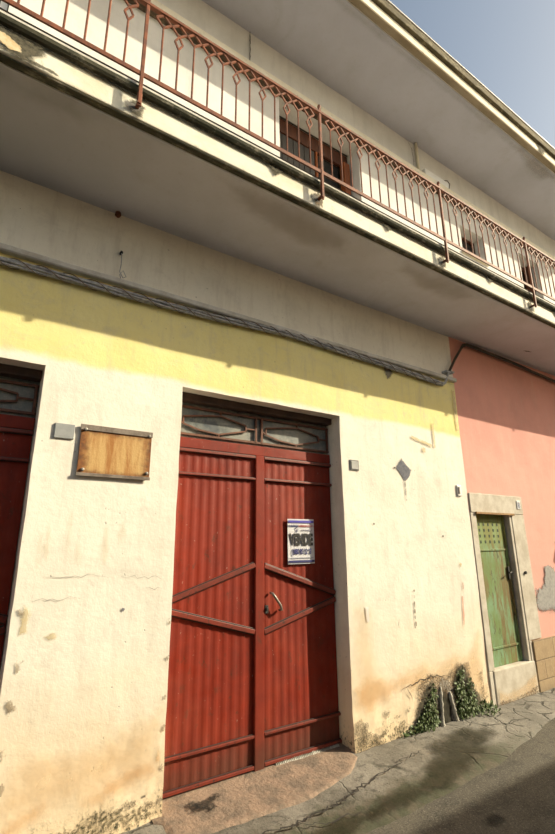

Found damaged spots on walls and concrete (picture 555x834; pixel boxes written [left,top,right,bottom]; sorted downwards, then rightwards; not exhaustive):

damp [0,24,555,314]
flaking render [535,559,555,612]
damp [360,663,487,747]
damp [58,801,155,834]